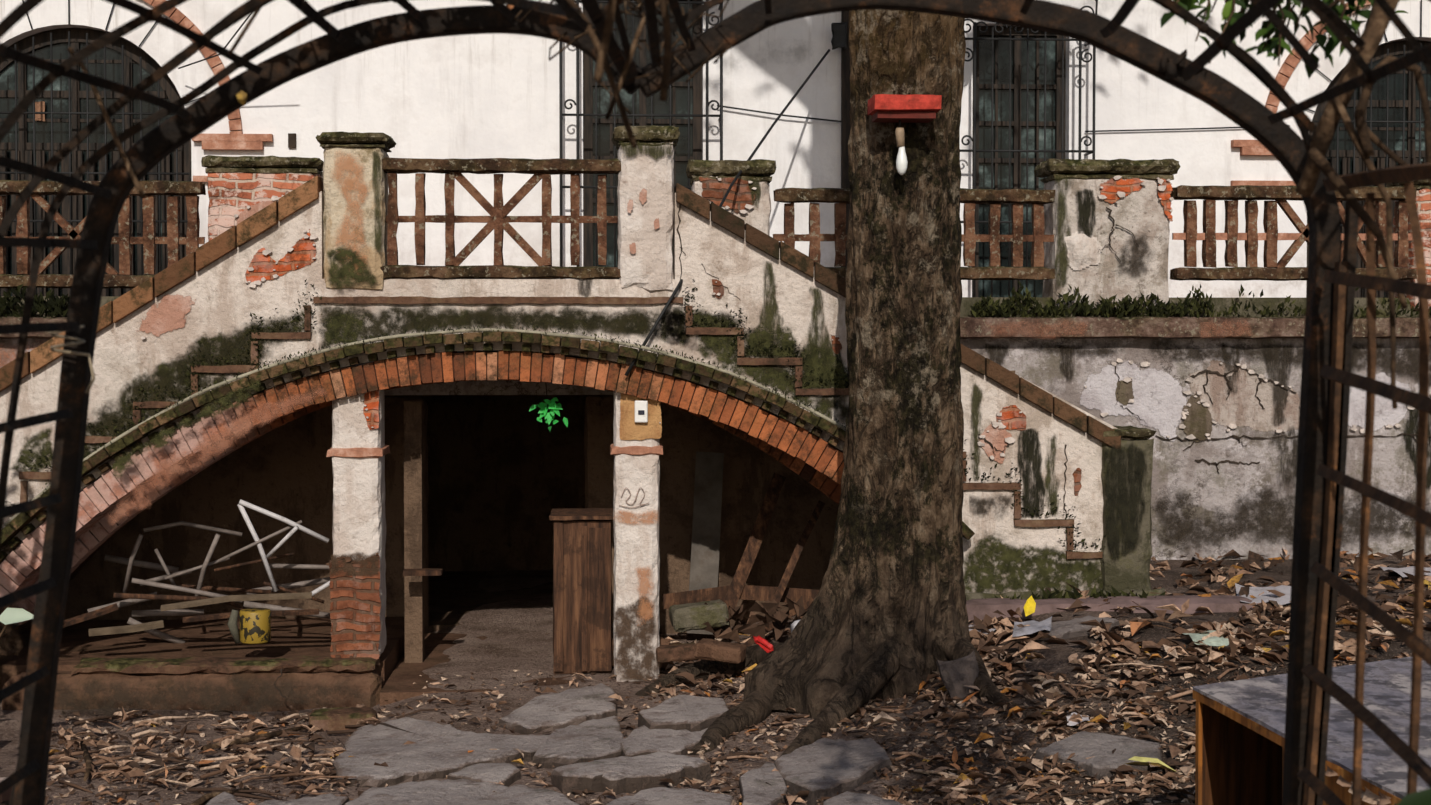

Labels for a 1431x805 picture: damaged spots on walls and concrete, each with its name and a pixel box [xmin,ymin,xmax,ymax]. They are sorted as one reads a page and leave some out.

spalling [245,229,318,288]
water stain [327,151,382,289]
crack [1098,207,1139,262]
spalling [1098,175,1174,222]
water stain [320,278,690,350]
spalling [977,405,1027,464]
water stain [1018,428,1045,518]
water stain [1032,342,1115,380]
flaking render [1080,358,1300,442]
water stain [1105,340,1303,560]
water stain [1341,406,1431,547]
water stain [1351,343,1431,386]